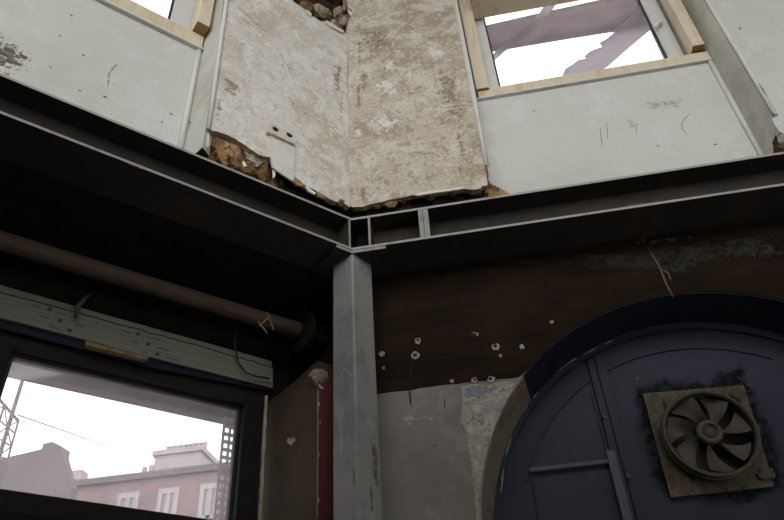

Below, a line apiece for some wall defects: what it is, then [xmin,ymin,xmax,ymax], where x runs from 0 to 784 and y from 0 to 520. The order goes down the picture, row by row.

flaking render [293,0,353,33]
water stain [357,27,386,107]
water stain [435,71,465,156]
flaking render [206,133,509,218]
peeling [450,376,516,520]